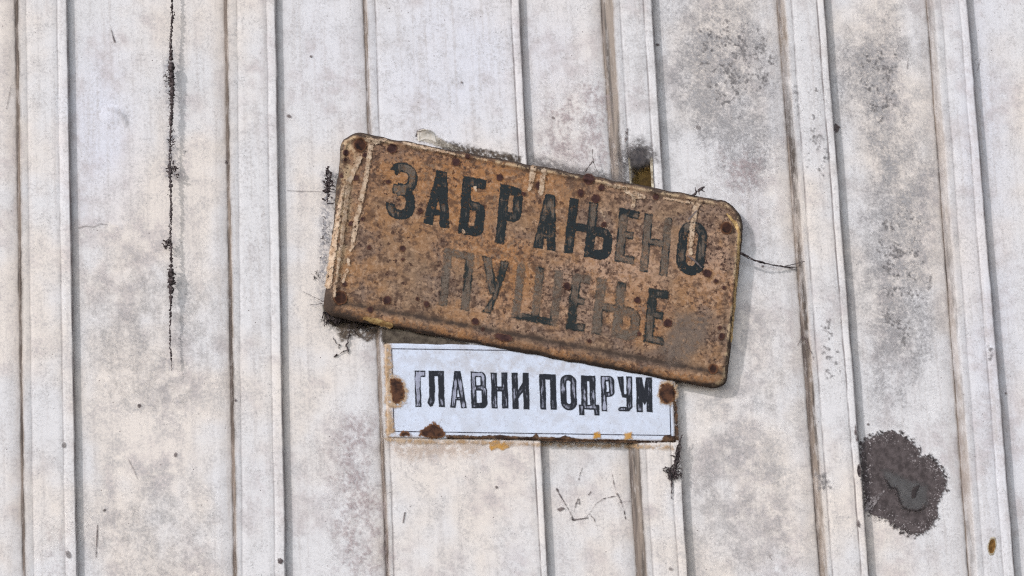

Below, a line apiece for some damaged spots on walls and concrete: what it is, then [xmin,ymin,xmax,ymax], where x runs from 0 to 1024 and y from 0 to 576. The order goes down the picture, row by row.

leakage [859,430,950,539]